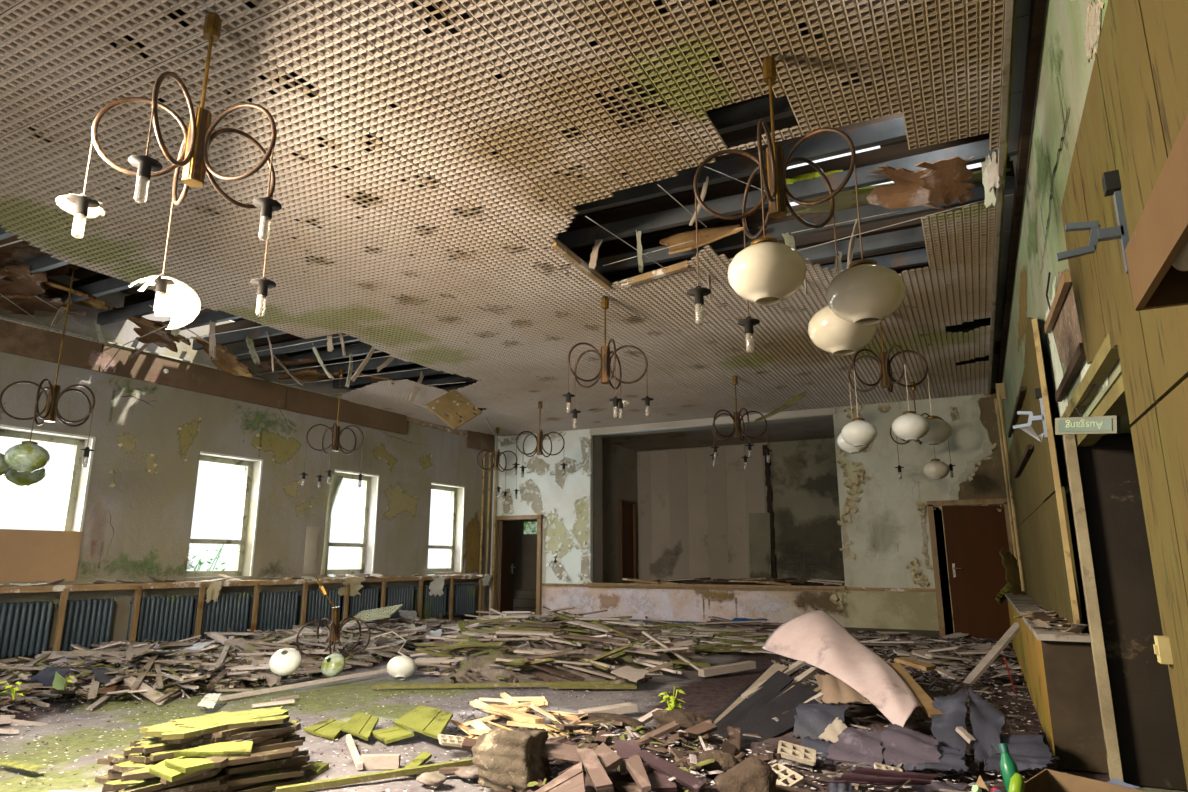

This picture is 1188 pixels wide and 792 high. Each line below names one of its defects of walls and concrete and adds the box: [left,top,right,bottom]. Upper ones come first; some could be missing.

peeling [1085,0,1104,62]
peeling [252,430,302,464]
peeling [320,475,344,575]
peeling [499,435,592,585]
water stain [777,511,844,575]
peeling [835,441,874,561]
flaking render [906,389,1010,587]